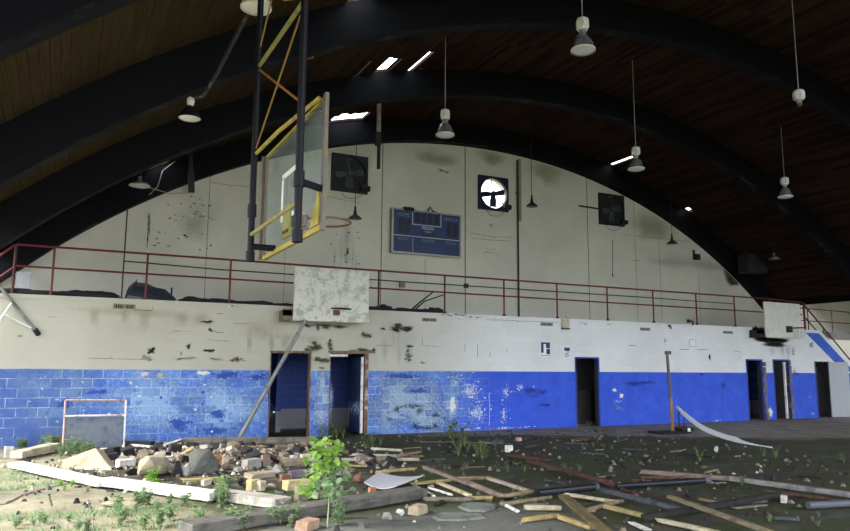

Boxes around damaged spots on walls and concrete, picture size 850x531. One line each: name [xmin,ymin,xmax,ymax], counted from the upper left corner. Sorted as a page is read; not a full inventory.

peeling [17,369,275,440]
peeling [359,372,535,432]